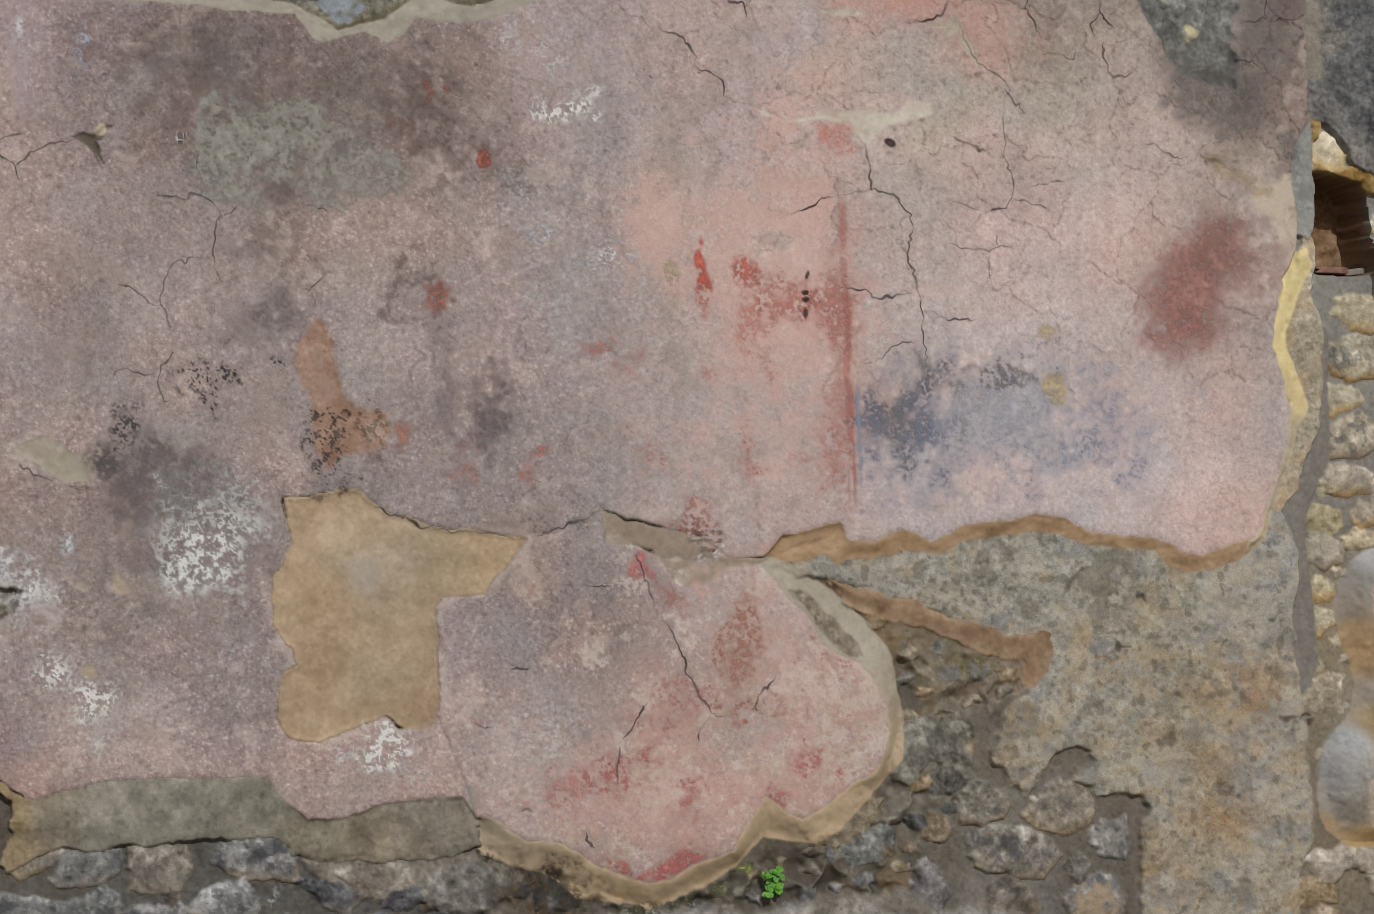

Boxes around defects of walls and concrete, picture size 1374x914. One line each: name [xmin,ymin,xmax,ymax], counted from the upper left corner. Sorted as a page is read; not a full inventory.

flaking render [791,510,1315,914]